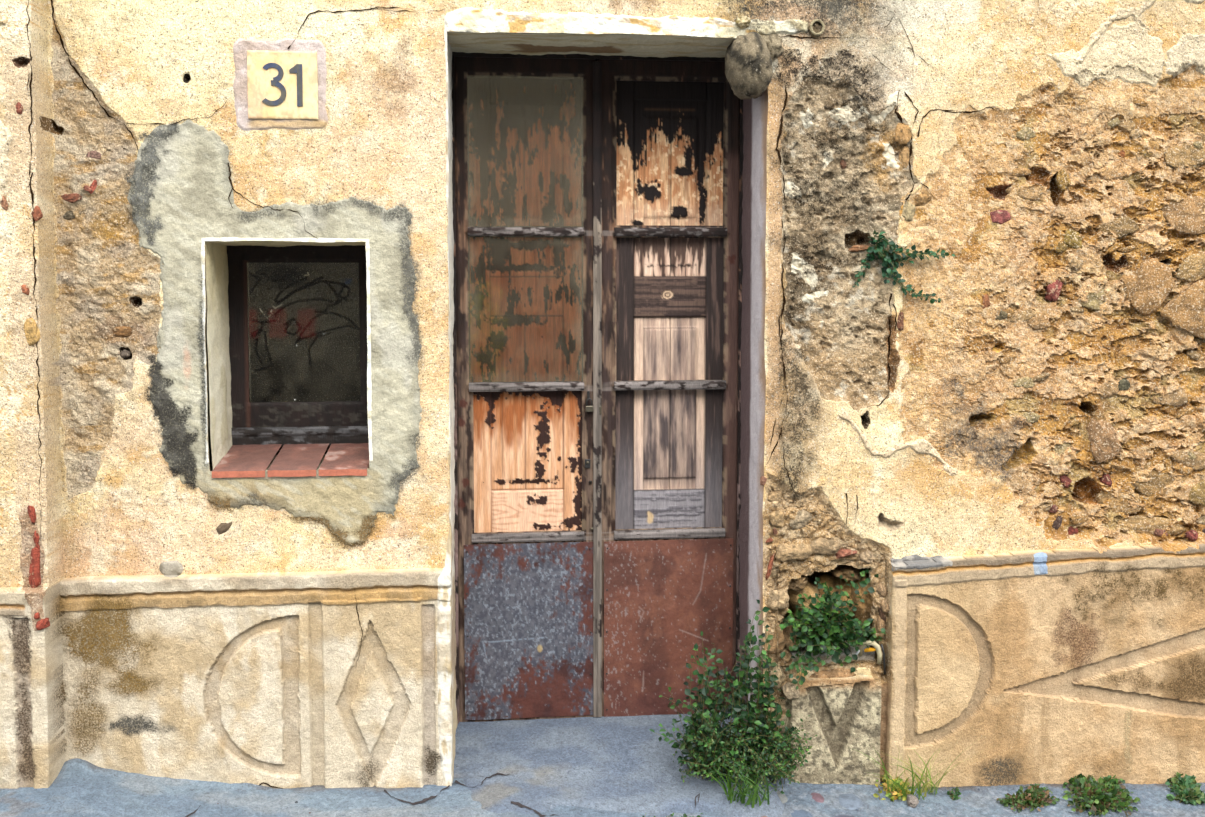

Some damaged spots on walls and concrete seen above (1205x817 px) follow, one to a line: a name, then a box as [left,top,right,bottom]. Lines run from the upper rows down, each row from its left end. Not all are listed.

crack [26,0,228,546]
crack [287,6,443,50]
water stain [724,0,892,35]
water stain [771,49,888,306]
crack [873,14,1002,220]
spalling [780,0,1205,553]
water stain [54,594,171,755]